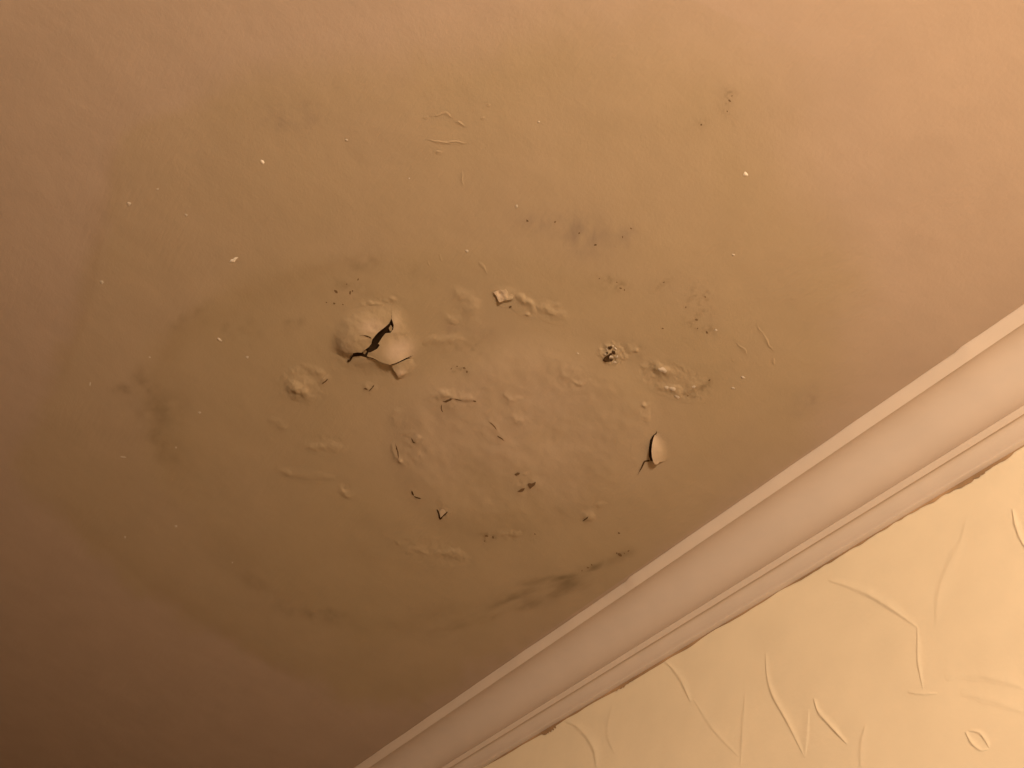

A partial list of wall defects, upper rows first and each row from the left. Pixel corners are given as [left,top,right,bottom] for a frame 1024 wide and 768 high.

leakage [41,134,125,411]
leakage [145,258,328,386]
peeling [487,282,523,308]
peeling [594,338,630,369]
leakage [679,274,722,342]
leakage [104,359,199,469]
leakage [154,453,199,508]
peeling [630,430,671,474]
leakage [606,542,642,565]
leakage [46,497,360,696]
leakage [353,590,510,641]
leakage [419,555,620,642]